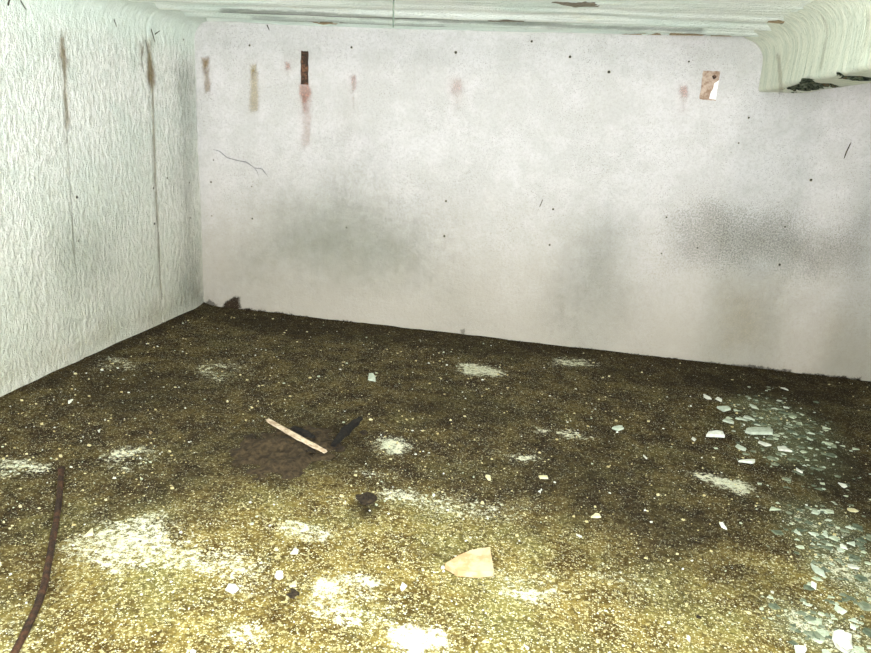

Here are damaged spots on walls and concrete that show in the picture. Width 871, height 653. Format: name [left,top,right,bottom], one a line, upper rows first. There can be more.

spalling [787,72,871,93]